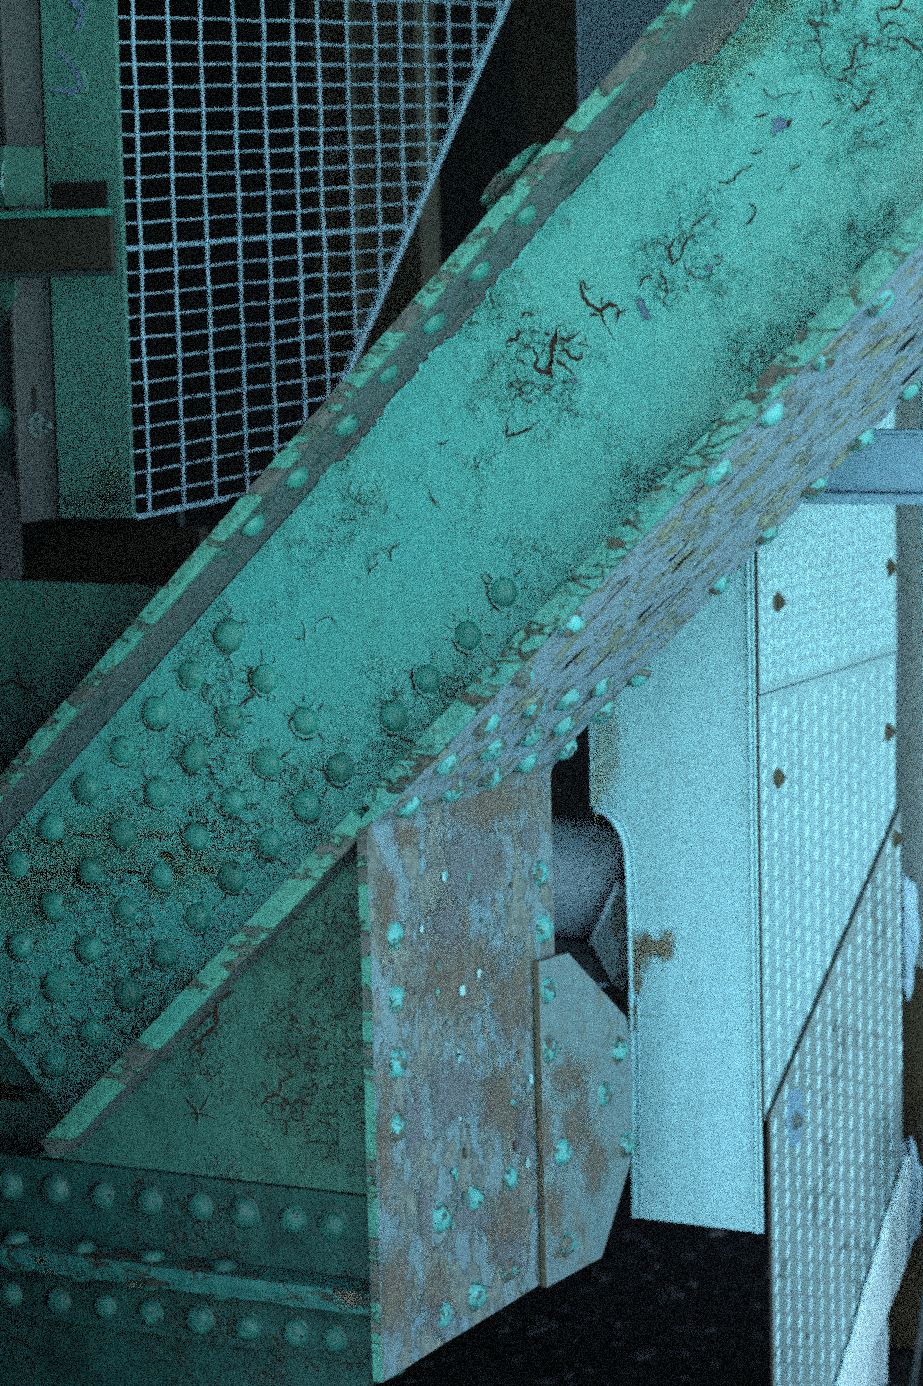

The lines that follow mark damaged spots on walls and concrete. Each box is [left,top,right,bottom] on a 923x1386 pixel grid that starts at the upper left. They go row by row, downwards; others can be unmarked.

peeling [629,0,759,127]
peeling [769,113,795,139]
peeling [318,199,566,481]
crack [367,0,923,575]
peeling [635,294,656,322]
peeling [832,273,923,387]
peeling [494,426,832,765]
peeling [182,989,241,1057]
corrosion [411,923,483,1006]
corrosion [494,965,528,1039]
corrosion [627,932,674,1029]
corrosion [542,1058,605,1194]